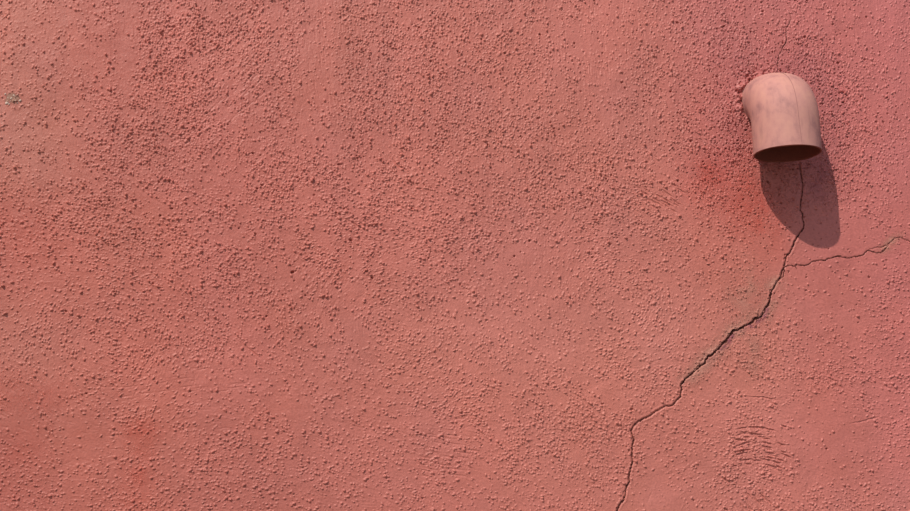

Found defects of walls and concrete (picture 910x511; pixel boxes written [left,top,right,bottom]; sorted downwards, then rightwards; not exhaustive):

crack [617,164,909,511]